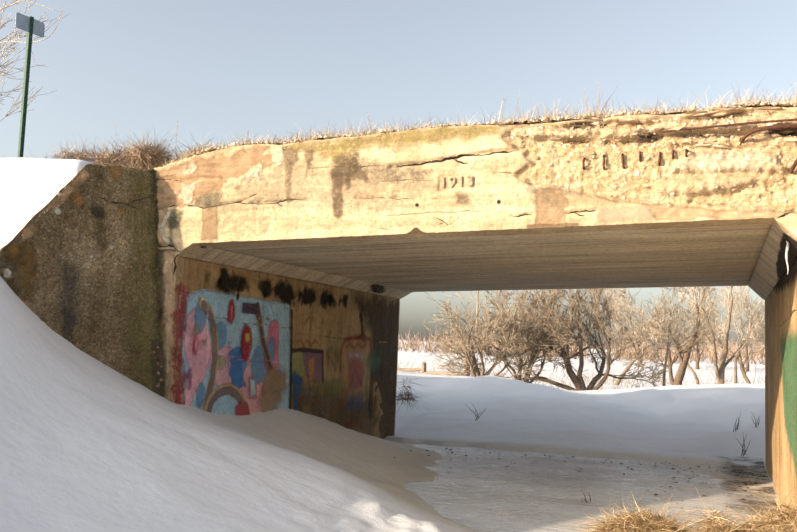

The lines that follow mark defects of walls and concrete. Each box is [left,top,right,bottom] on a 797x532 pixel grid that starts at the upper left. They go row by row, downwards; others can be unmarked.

crack [169,194,300,209]
leakage [330,153,366,217]
crack [303,150,519,230]
spalling [501,106,797,228]